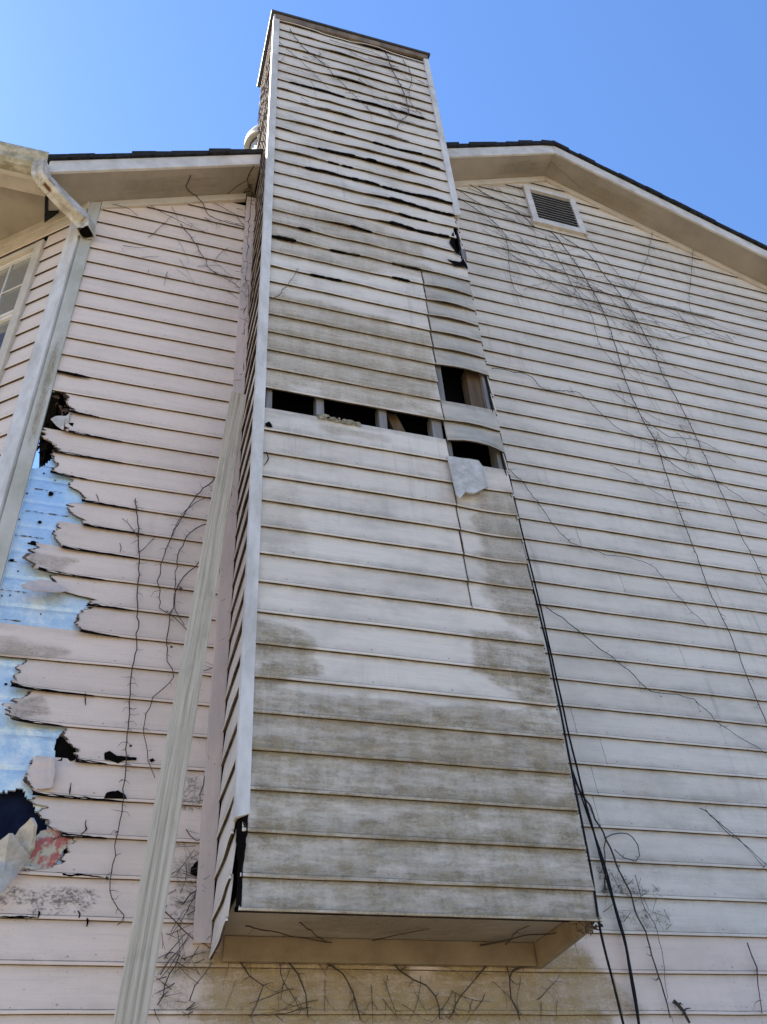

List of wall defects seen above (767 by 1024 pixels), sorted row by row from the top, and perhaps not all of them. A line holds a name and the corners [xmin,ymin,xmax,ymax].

peeling [51,413,70,430]
peeling [27,757,55,790]
water stain [246,629,659,934]
peeling [21,828,75,871]